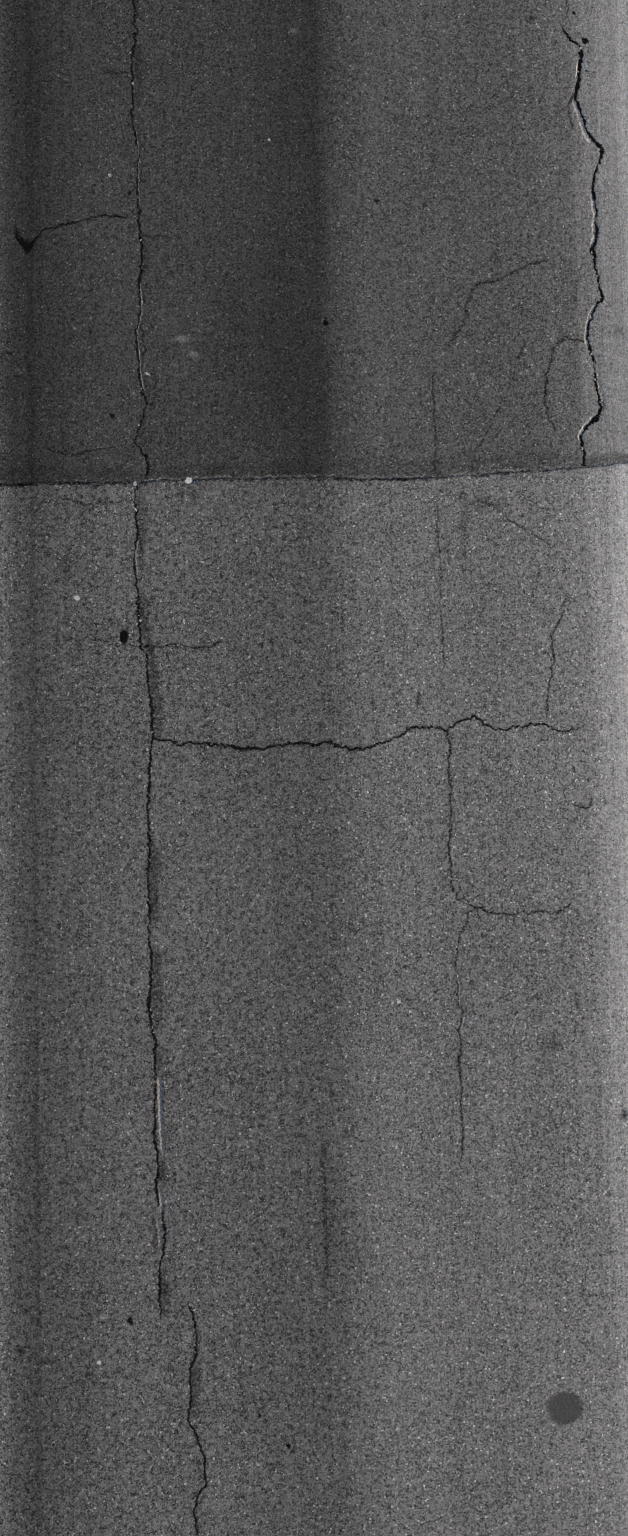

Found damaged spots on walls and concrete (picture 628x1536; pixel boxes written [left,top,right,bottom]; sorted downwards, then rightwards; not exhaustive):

crack [517,1,604,466]
crack [15,0,580,1317]
crack [187,1303,207,1536]